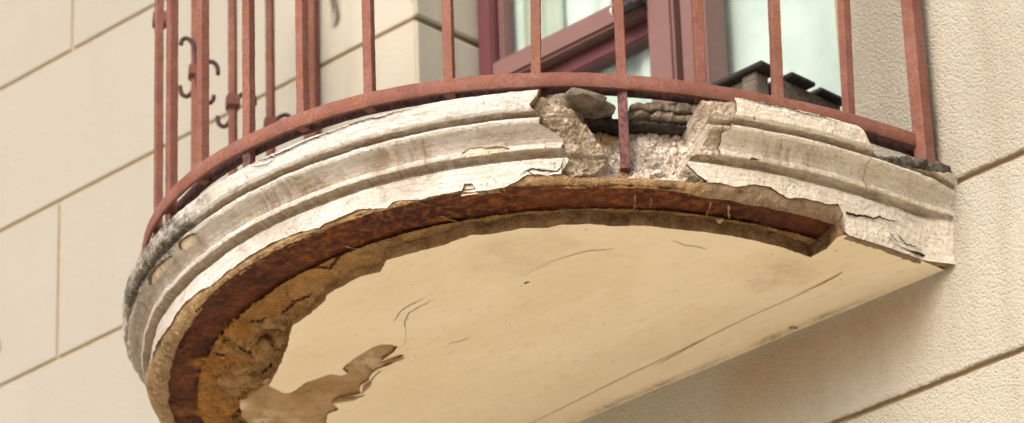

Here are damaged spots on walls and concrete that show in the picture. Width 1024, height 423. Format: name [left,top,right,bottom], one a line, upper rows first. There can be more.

spalling [145,97,842,423]
crack [846,159,925,257]
crack [532,272,842,423]